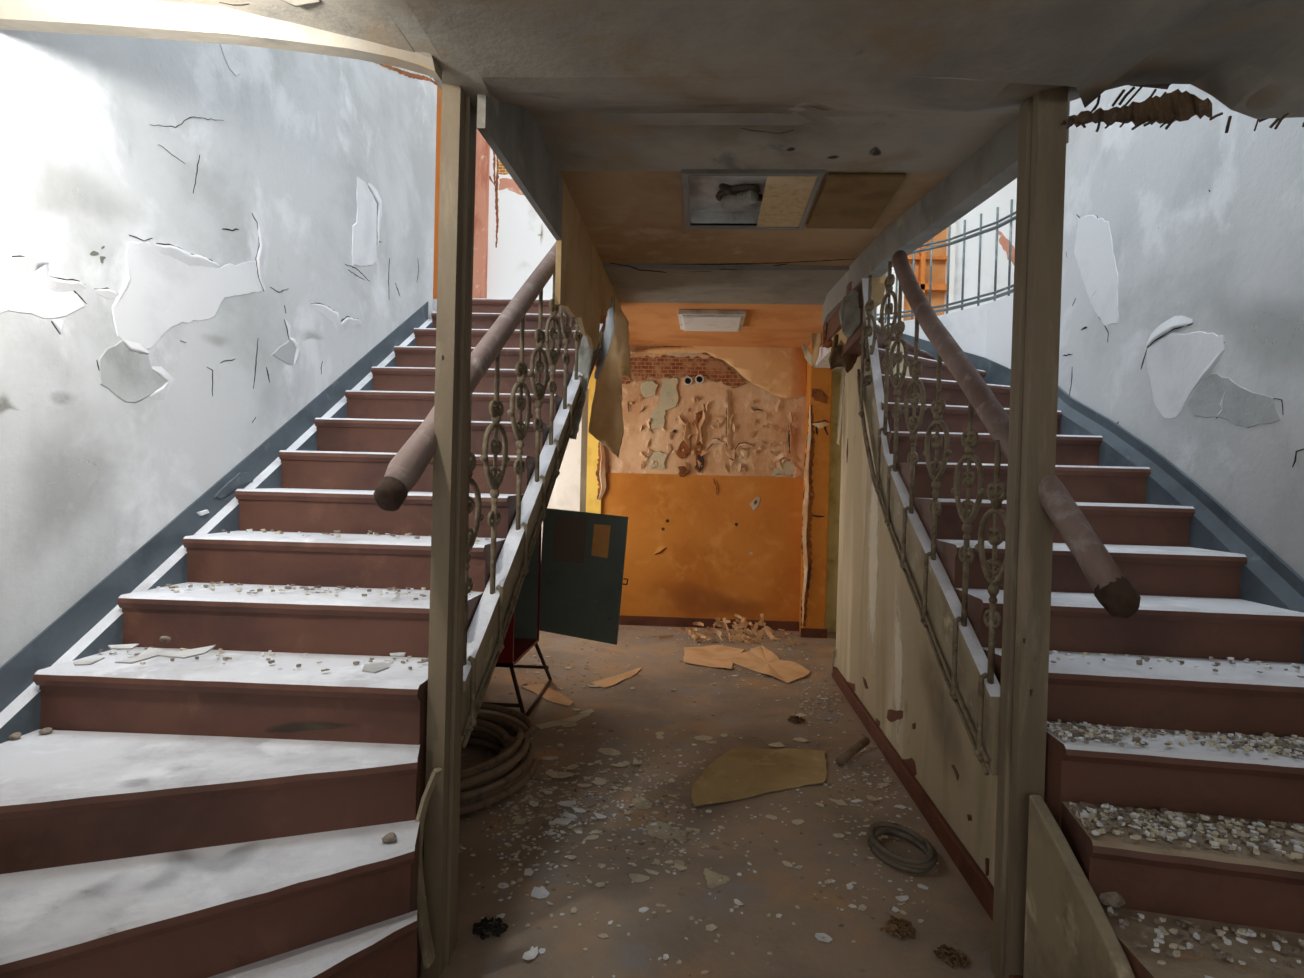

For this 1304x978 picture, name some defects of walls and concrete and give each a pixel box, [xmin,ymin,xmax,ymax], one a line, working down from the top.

crack [150,116,224,193]
flaking render [1061,84,1232,133]
flaking render [1254,113,1290,131]
peeling [0,256,85,319]
crack [129,235,220,269]
peeling [98,241,262,403]
crack [207,211,363,396]
peeling [352,176,377,267]
peeling [1074,215,1119,326]
peeling [1147,331,1281,428]
flaking render [622,349,828,626]